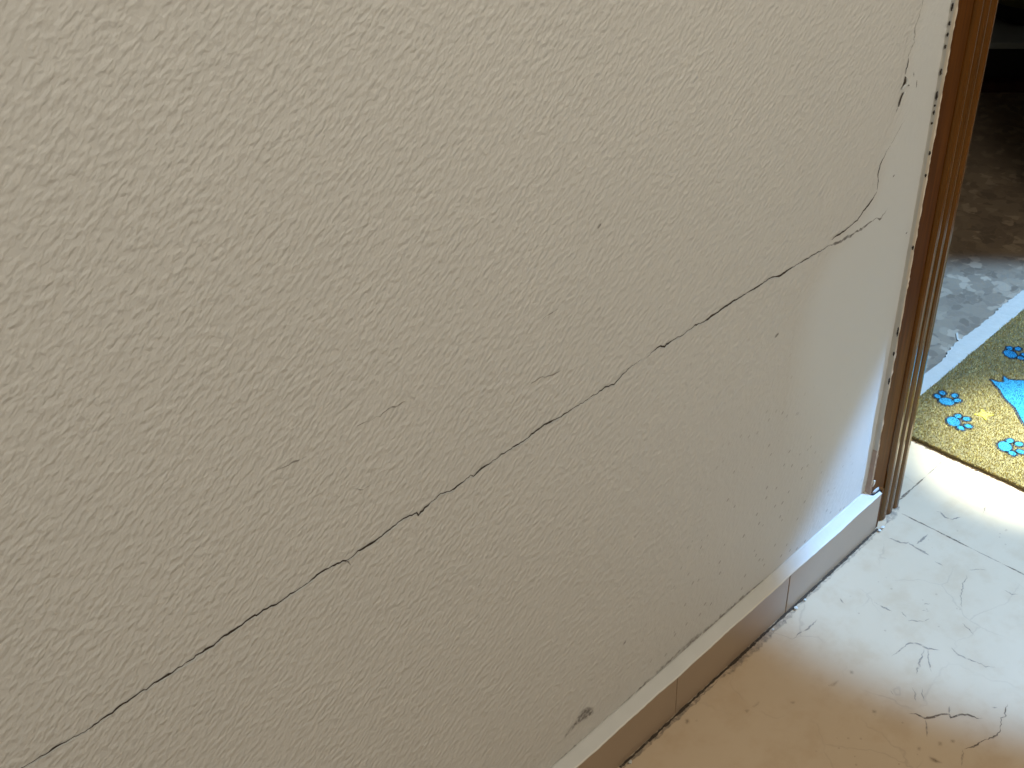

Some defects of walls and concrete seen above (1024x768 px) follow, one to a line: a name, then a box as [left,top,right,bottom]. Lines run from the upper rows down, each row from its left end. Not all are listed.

crack [22,148,889,768]